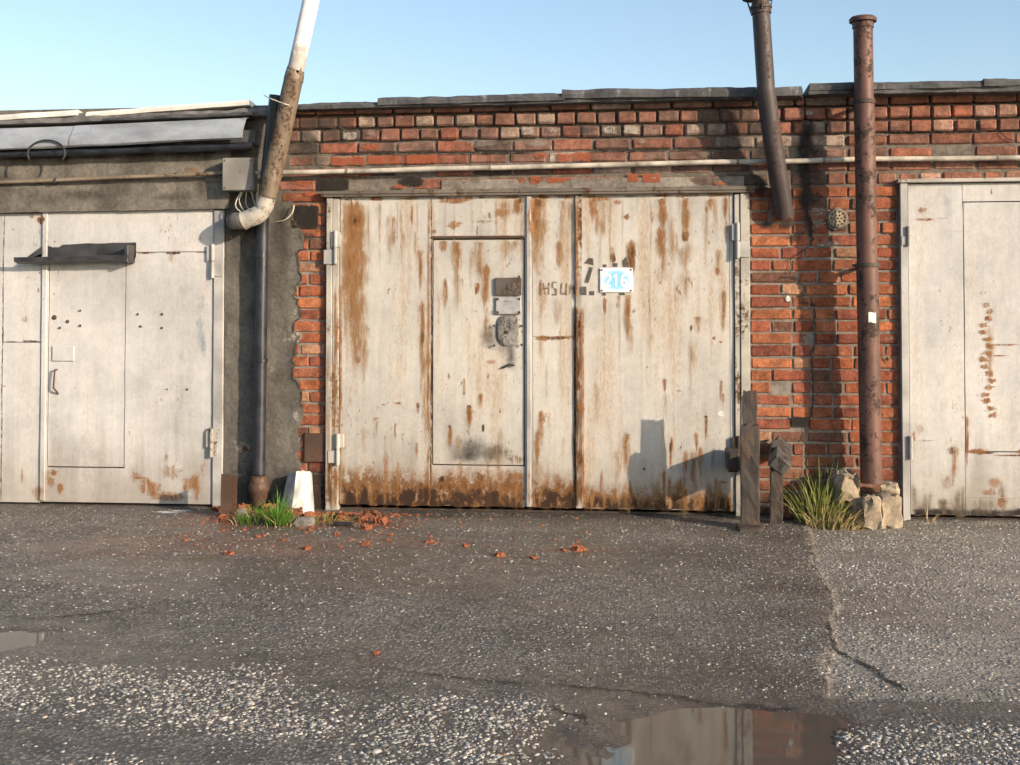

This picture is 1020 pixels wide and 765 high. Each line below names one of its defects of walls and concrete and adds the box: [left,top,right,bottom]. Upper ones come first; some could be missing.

corrosion [327,194,732,512]
corrosion [978,303,1014,418]
corrosion [135,455,199,500]
corrosion [947,417,1020,479]